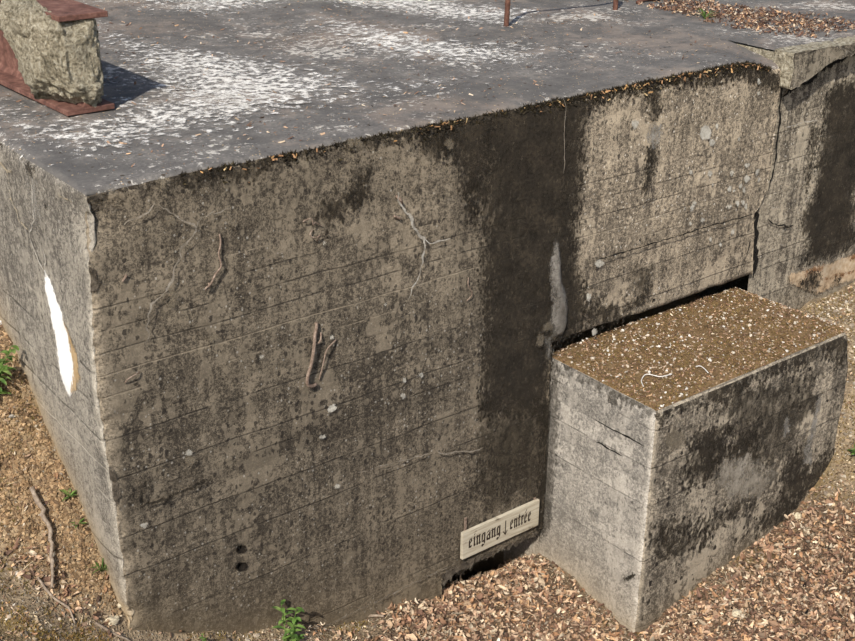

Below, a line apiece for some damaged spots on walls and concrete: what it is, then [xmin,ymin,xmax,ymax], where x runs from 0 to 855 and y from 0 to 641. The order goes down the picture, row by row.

crack [398,192,450,298]
water stain [453,98,655,536]
water stain [641,82,664,199]
crack [536,0,855,310]
water stain [644,371,835,571]